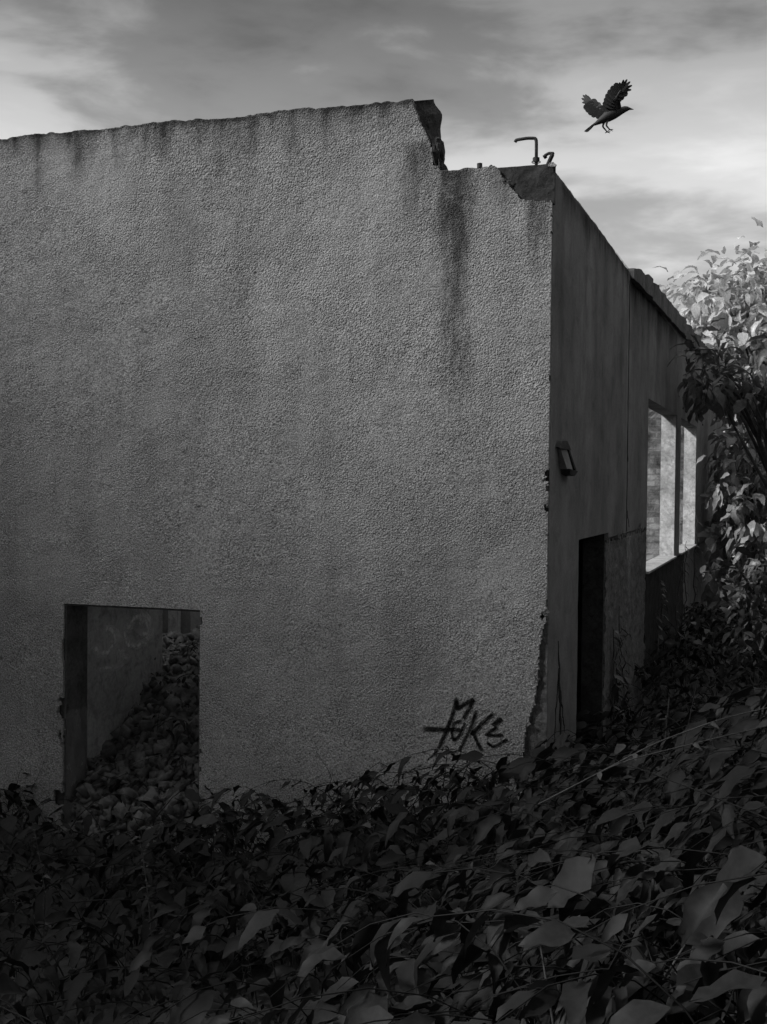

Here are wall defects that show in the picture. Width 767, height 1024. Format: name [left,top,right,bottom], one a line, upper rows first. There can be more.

water stain [0,116,246,143]
water stain [260,99,412,116]
spalling [414,99,448,170]
spalling [498,137,557,205]
spalling [523,609,550,758]